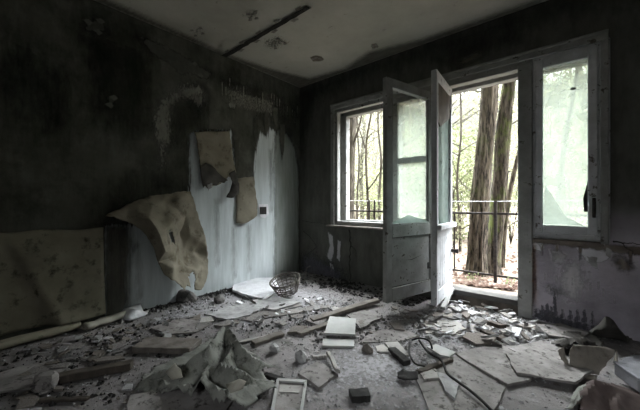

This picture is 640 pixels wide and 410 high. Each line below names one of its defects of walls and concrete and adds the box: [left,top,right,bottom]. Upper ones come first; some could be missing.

peeling [327,232,341,269]
peeling [576,244,612,268]
damp [532,239,640,331]